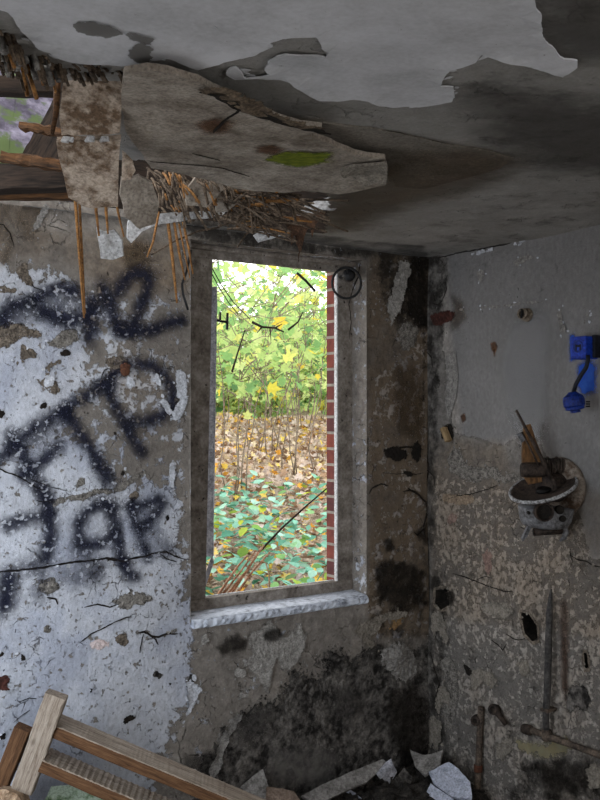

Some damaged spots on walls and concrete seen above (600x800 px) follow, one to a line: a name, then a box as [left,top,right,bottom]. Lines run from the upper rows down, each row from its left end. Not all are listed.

peeling [0,0,577,108]
flaking render [320,121,514,189]
damp [404,257,429,334]
flaking render [0,322,81,409]
peeling [152,369,190,421]
crack [369,446,435,541]
crack [0,551,189,573]
damp [376,562,428,611]
crack [135,628,178,652]
damp [264,629,283,641]
flaking render [195,586,472,797]
damp [386,685,428,767]